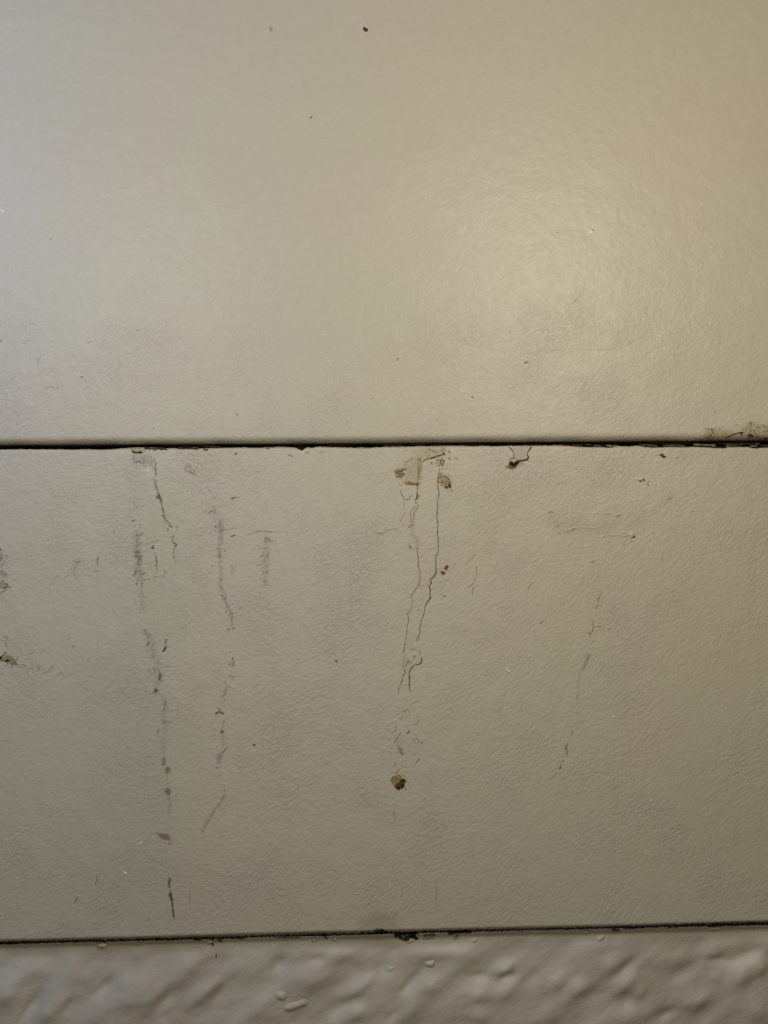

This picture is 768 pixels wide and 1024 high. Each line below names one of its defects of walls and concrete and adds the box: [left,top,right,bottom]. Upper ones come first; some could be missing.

crack [398,453,446,691]